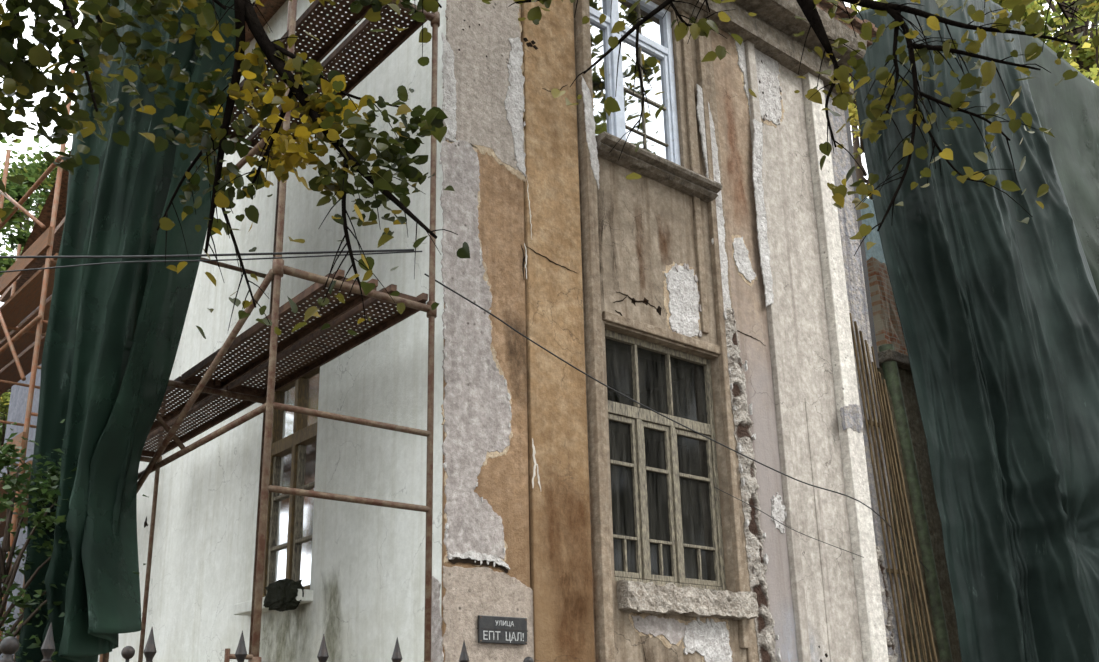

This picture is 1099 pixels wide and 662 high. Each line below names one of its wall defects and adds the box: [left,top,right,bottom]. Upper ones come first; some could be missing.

peeling [431,0,534,662]
crack [613,292,662,316]
spalling [662,262,702,338]
spalling [629,612,732,662]